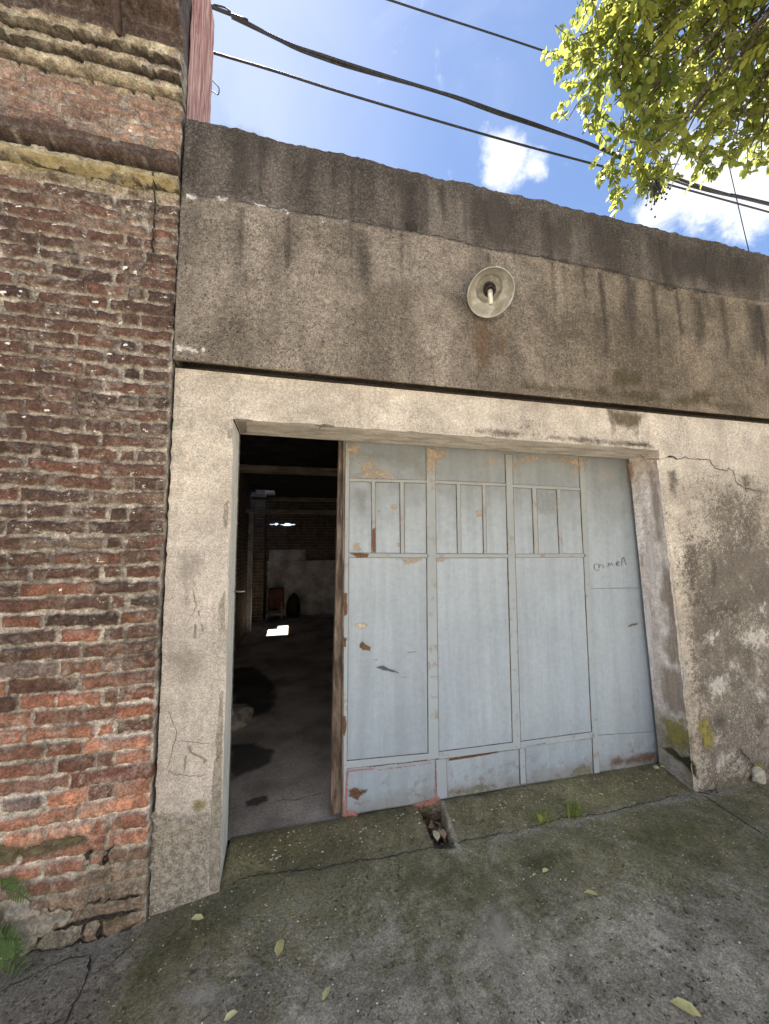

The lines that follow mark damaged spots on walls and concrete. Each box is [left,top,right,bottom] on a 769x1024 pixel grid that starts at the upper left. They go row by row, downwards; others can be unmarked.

crack [150,170,159,264]
damp [750,307,765,349]
crack [640,455,766,493]
rust [351,528,376,557]
damp [740,626,769,649]
damp [709,661,736,699]
rust [349,788,367,800]
crack [224,748,768,886]
crack [1,895,140,1024]